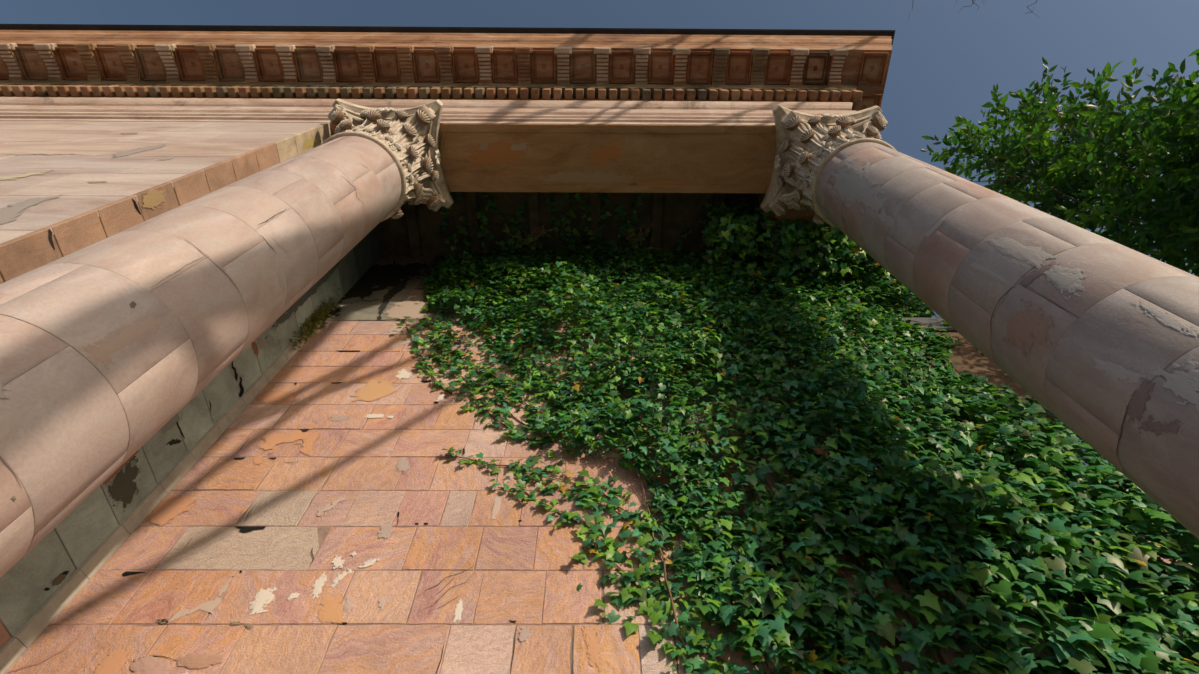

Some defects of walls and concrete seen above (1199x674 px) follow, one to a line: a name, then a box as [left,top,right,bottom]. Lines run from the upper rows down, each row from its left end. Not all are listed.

crack [47,229,55,250]
crack [231,361,244,397]
peeling [248,551,379,624]